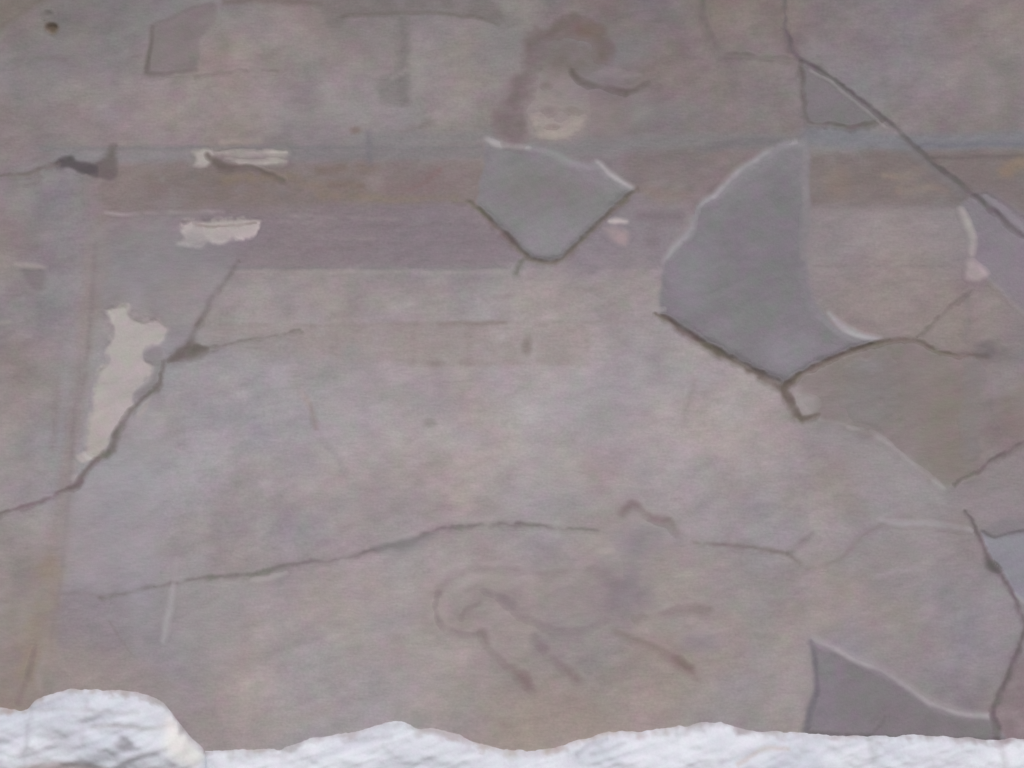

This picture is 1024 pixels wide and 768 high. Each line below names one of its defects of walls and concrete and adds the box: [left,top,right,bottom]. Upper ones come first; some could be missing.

flaking render [178,215,263,242]
flaking render [190,136,293,185]
crack [695,0,1024,239]
flaking render [66,303,166,482]
crack [0,259,305,520]
crack [651,285,975,426]
crack [153,517,601,591]
crack [689,523,887,574]
crack [952,438,1024,740]